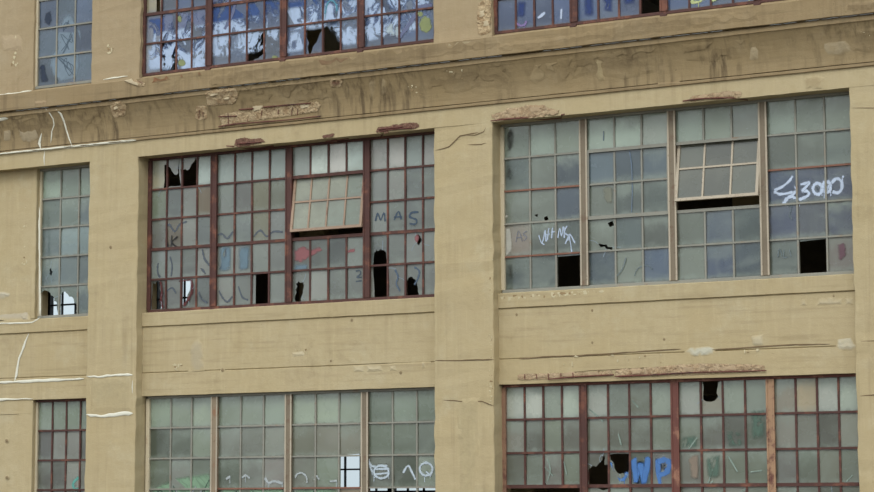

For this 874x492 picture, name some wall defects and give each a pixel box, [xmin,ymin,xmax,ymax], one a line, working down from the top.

leakage [209,11,759,104]
leakage [803,75,825,89]
spalling [195,88,321,127]
spalling [491,105,565,121]
crack [0,108,136,164]
spalling [226,137,274,149]
crack [438,130,485,150]
crack [0,208,133,418]